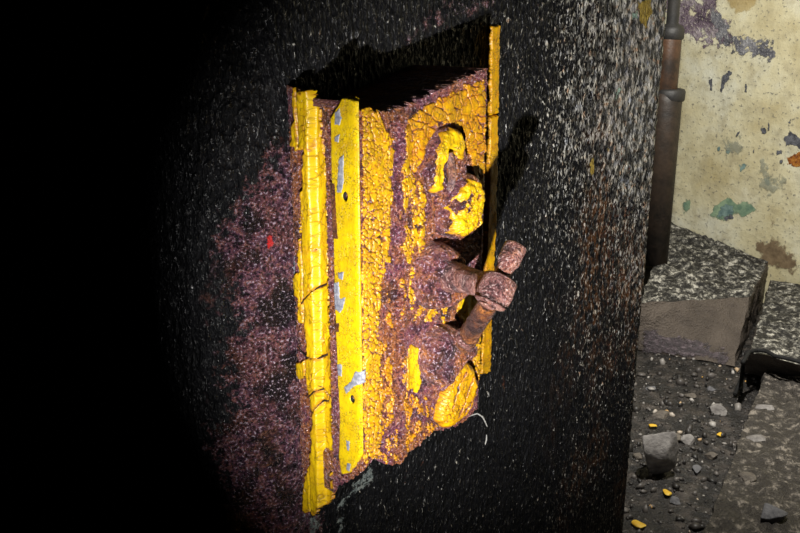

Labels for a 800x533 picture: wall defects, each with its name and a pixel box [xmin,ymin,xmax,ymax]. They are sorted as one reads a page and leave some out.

spalling [679,0,776,62]
corrosion [330,182,338,239]
peeling [290,79,487,517]
corrosion [199,135,324,533]
crack [297,345,330,359]